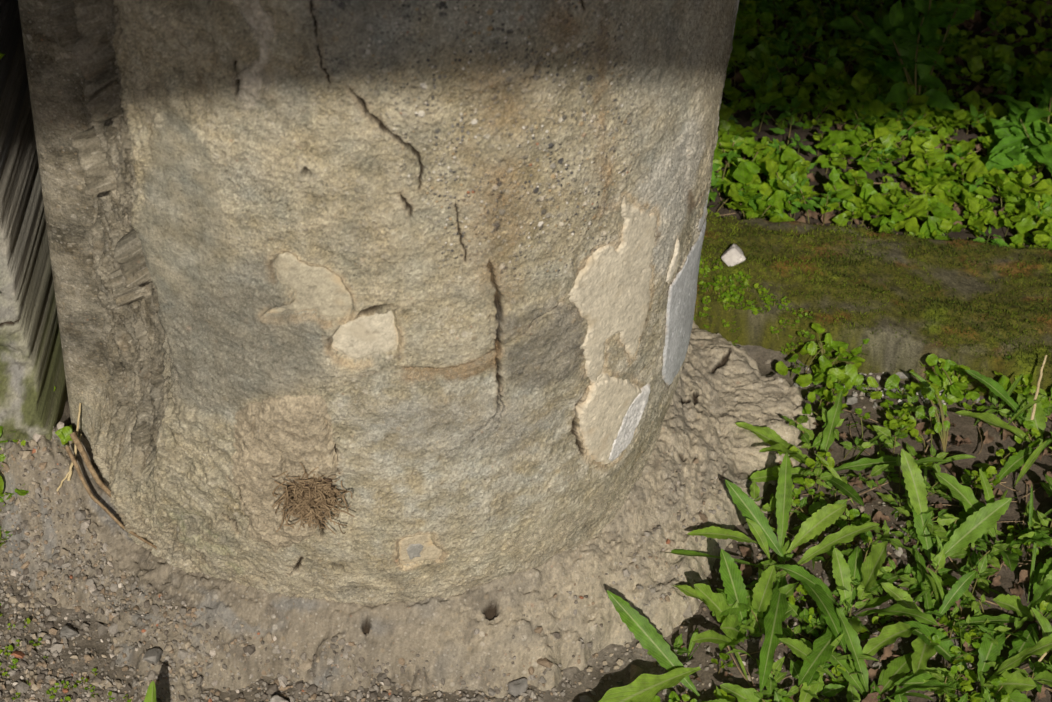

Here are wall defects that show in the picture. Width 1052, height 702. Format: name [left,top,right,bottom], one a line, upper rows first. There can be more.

crack [310,0,423,215]
spalling [267,252,398,359]
crack [455,203,505,435]
flaking render [568,197,657,465]
flaking render [662,189,710,386]